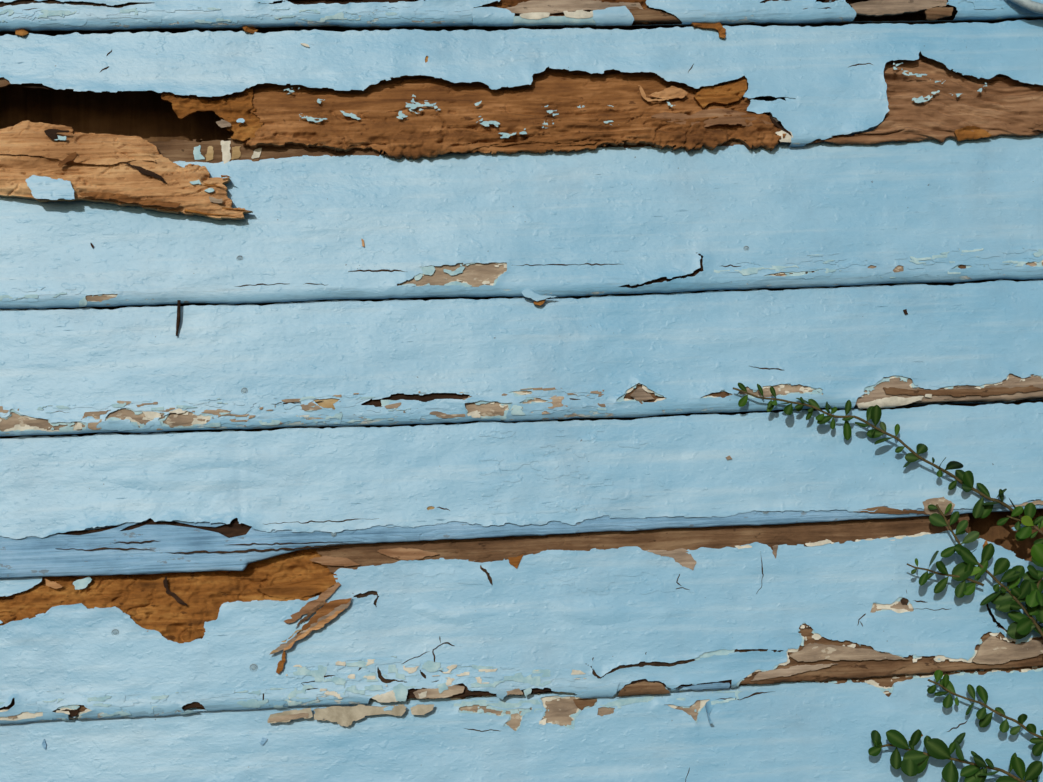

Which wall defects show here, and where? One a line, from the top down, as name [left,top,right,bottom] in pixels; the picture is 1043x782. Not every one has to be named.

peeling [893,63,962,103]
peeling [193,119,262,164]
peeling [397,94,440,119]
peeling [475,101,527,138]
peeling [776,130,793,142]
peeling [397,262,507,290]
peeling [0,383,666,436]
peeling [854,373,1043,409]
crack [55,519,356,554]
peeling [0,497,973,597]
peeling [995,559,1043,642]
peeling [0,656,742,731]